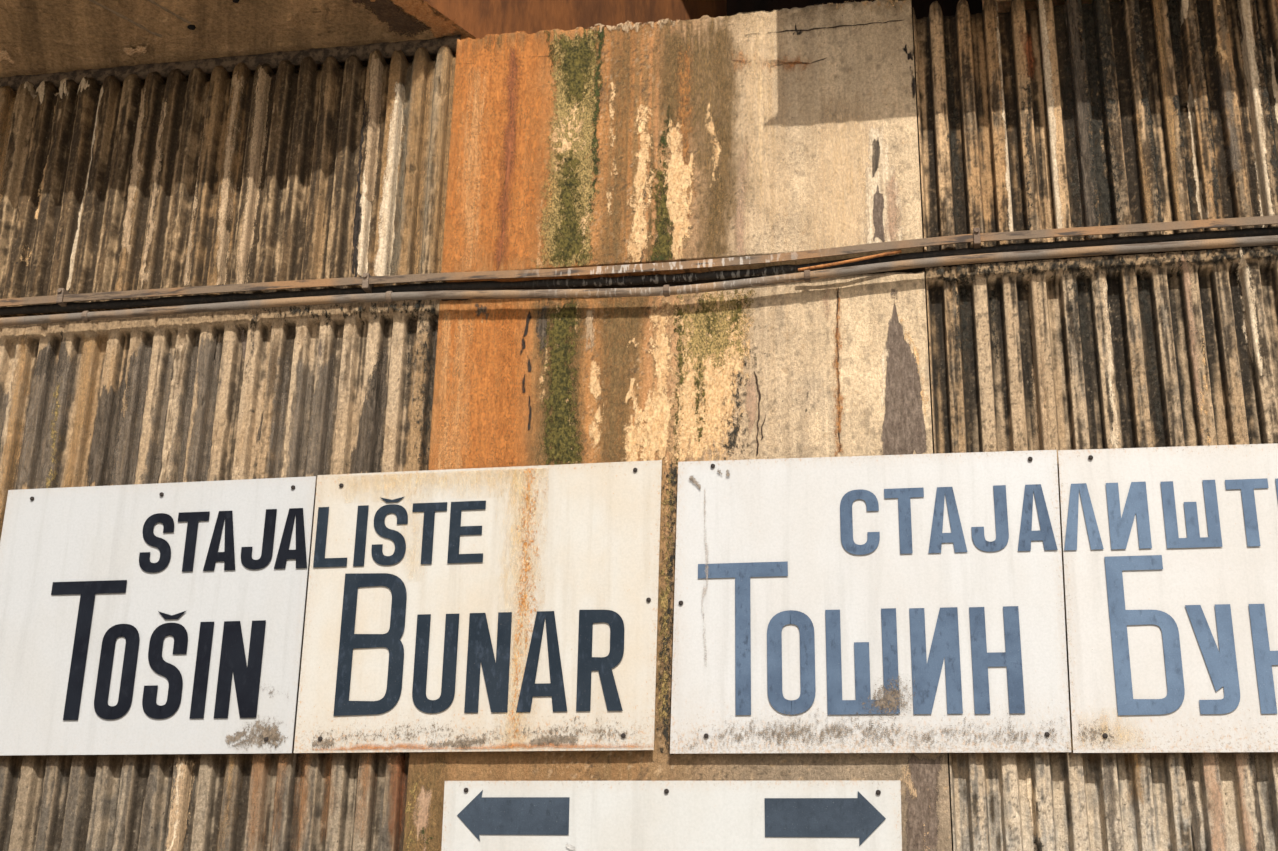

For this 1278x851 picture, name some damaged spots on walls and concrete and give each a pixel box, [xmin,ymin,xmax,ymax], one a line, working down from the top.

water stain [237,66,272,284]
water stain [373,65,413,276]
rust [351,0,548,274]
peeling [606,82,618,215]
peeling [624,94,695,262]
water stain [996,0,1166,241]
water stain [1165,0,1278,232]
water stain [15,331,76,490]
water stain [87,334,223,487]
water stain [250,340,337,479]
water stain [346,300,439,474]
water stain [1237,247,1263,376]